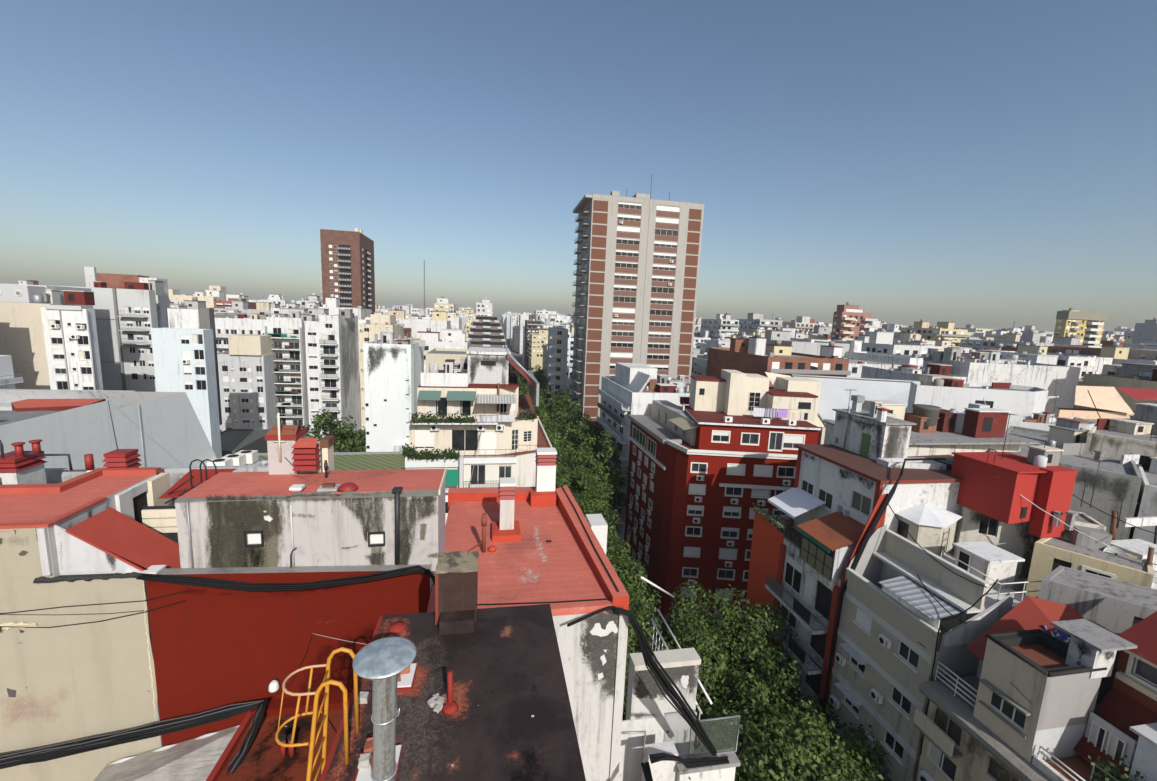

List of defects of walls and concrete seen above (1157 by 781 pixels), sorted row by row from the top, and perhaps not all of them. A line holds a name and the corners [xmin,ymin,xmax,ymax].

leakage [207,493,436,568]
peeling [0,622,37,644]
corrosion [378,618,409,639]
corrosion [397,662,428,698]
corrosion [443,680,472,720]
peeling [590,621,618,680]
leakage [252,715,312,781]
corrosion [329,679,372,781]